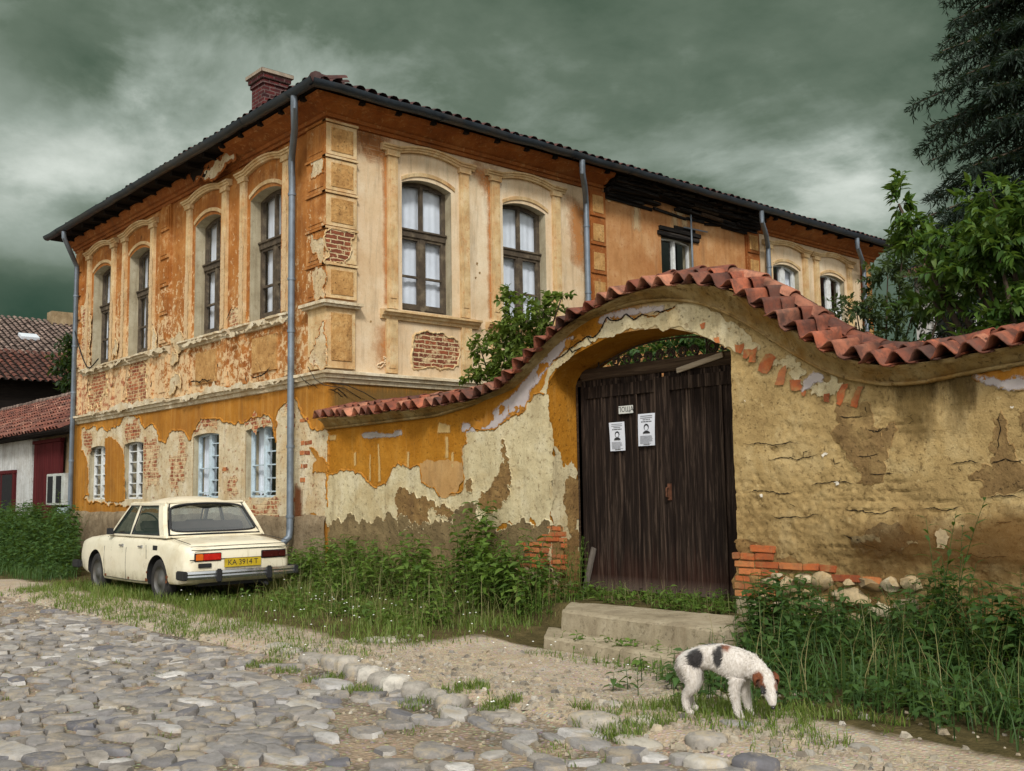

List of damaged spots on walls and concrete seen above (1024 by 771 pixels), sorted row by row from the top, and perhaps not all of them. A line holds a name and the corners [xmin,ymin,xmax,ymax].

flaking render [310,227,355,301]
peeling [971,366,1024,392]
peeling [80,250,899,596]
crack [744,407,893,519]
crack [954,414,1024,471]